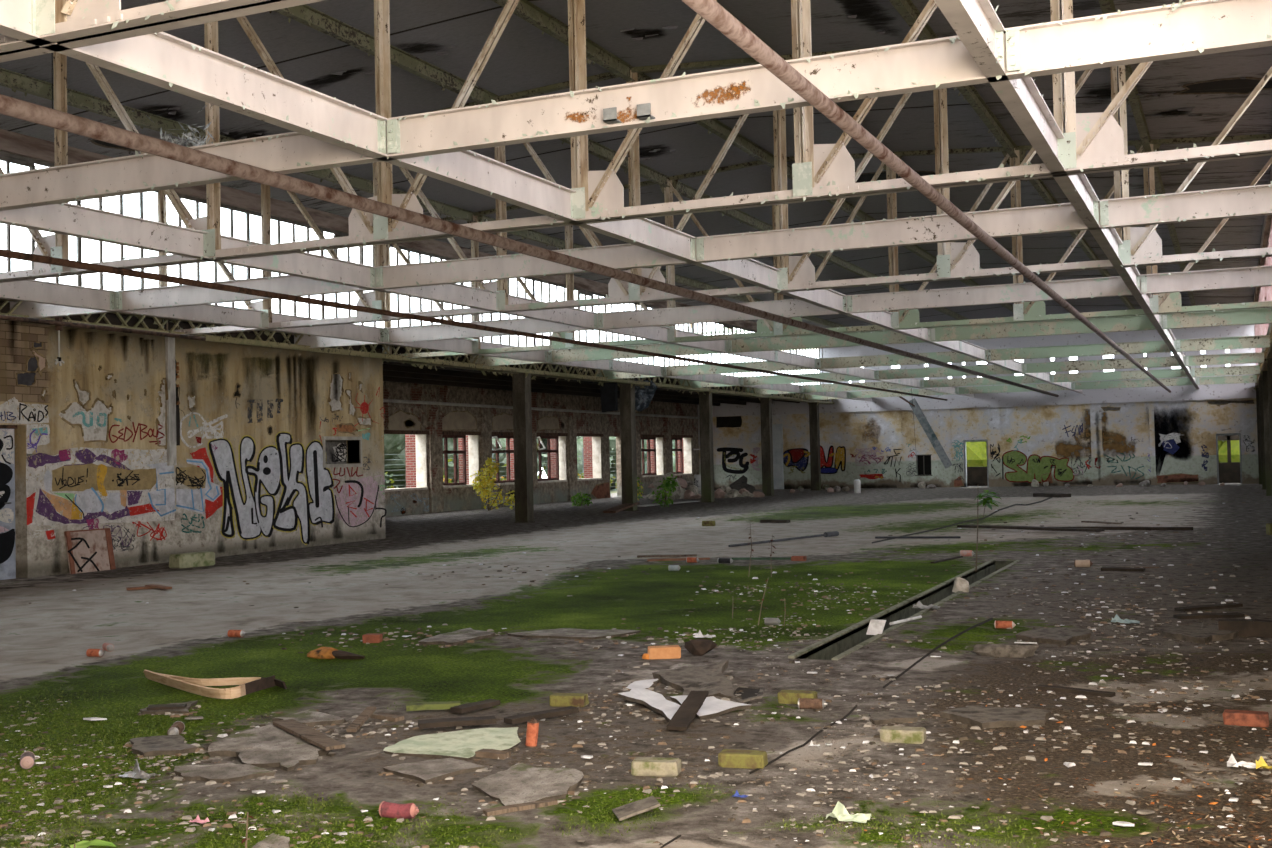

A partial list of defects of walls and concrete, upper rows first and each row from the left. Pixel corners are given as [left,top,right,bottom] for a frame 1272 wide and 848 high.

damp [836,0,896,34]
rust [694,81,750,105]
rust [566,112,589,123]
rust [617,97,640,123]
damp [187,353,227,385]
damp [250,355,315,427]
damp [1013,409,1135,486]